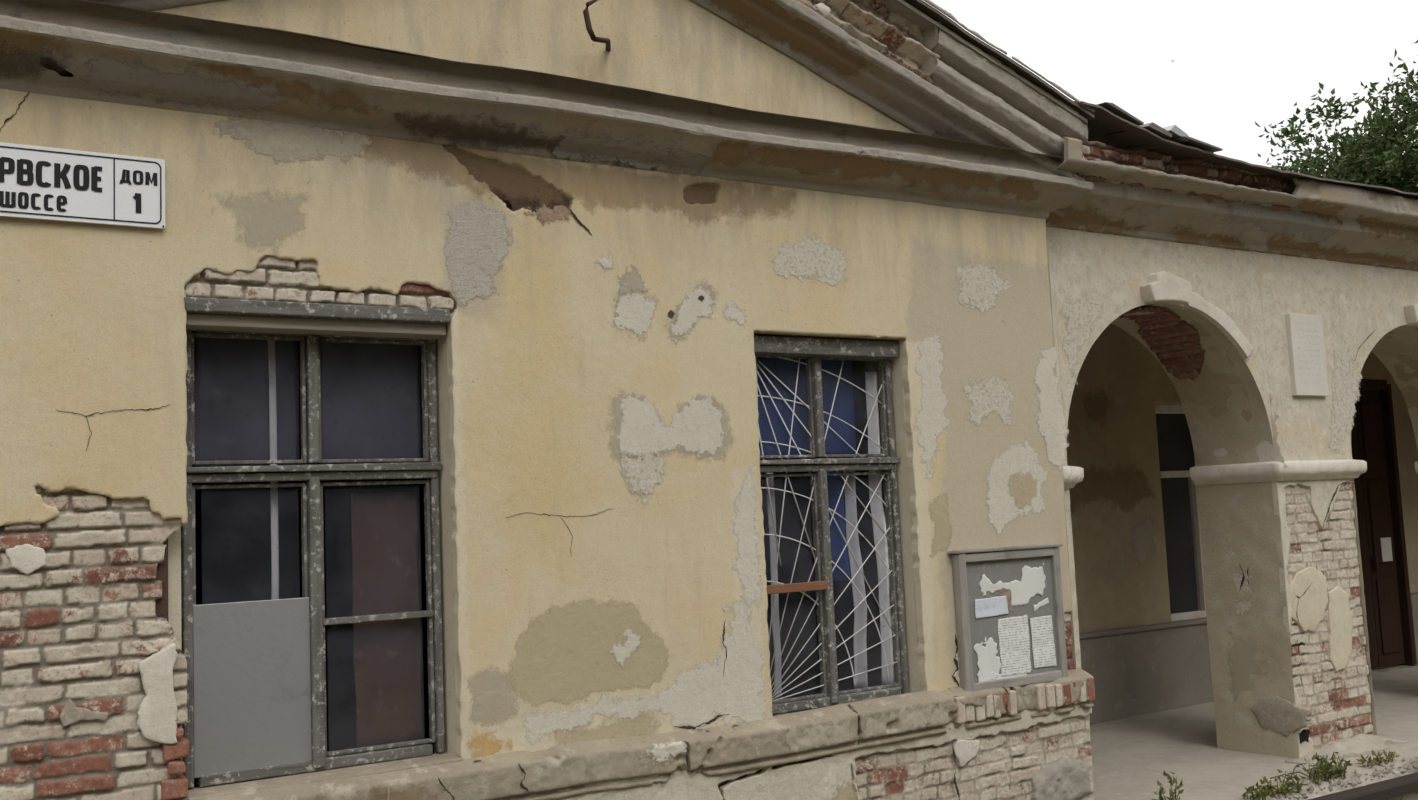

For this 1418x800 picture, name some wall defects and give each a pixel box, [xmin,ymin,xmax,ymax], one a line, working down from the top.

peeling [769,234,848,287]
peeling [953,255,1010,314]
flaking render [1119,305,1205,381]
crack [57,404,170,450]
peeling [611,394,732,505]
peeling [913,335,1015,479]
peeling [986,346,1069,535]
crack [506,508,610,555]
flaking render [0,486,189,800]
damp [509,599,668,706]
flaking render [785,612,1095,800]
flaking render [1250,483,1374,749]